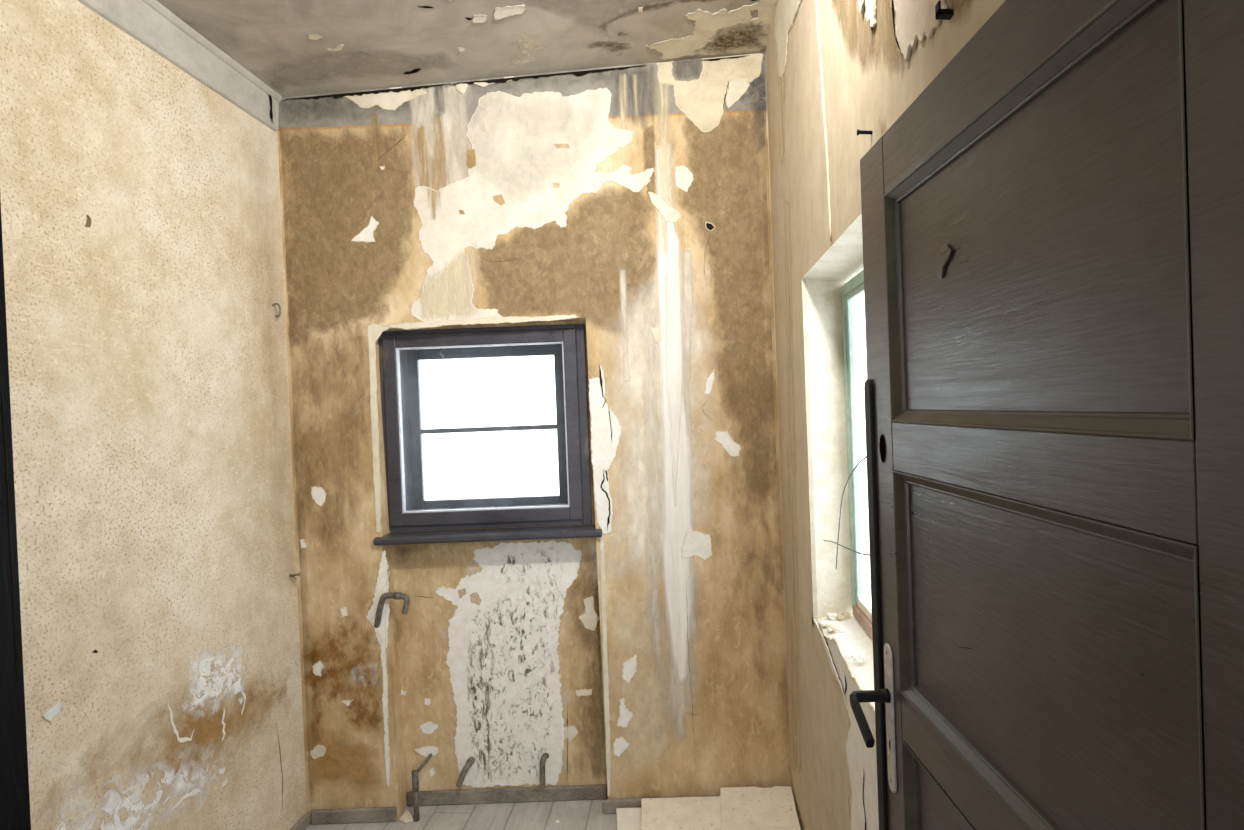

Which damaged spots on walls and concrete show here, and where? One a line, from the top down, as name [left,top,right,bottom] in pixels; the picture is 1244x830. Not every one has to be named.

flaking render [343,89,427,111]
peeling [472,4,526,23]
peeling [646,0,802,160]
peeling [891,0,948,62]
water stain [280,83,468,539]
peeling [367,88,654,533]
water stain [479,61,801,773]
peeling [435,377,637,796]
water stain [56,648,247,830]
peeling [414,721,439,777]
water stain [469,591,549,778]